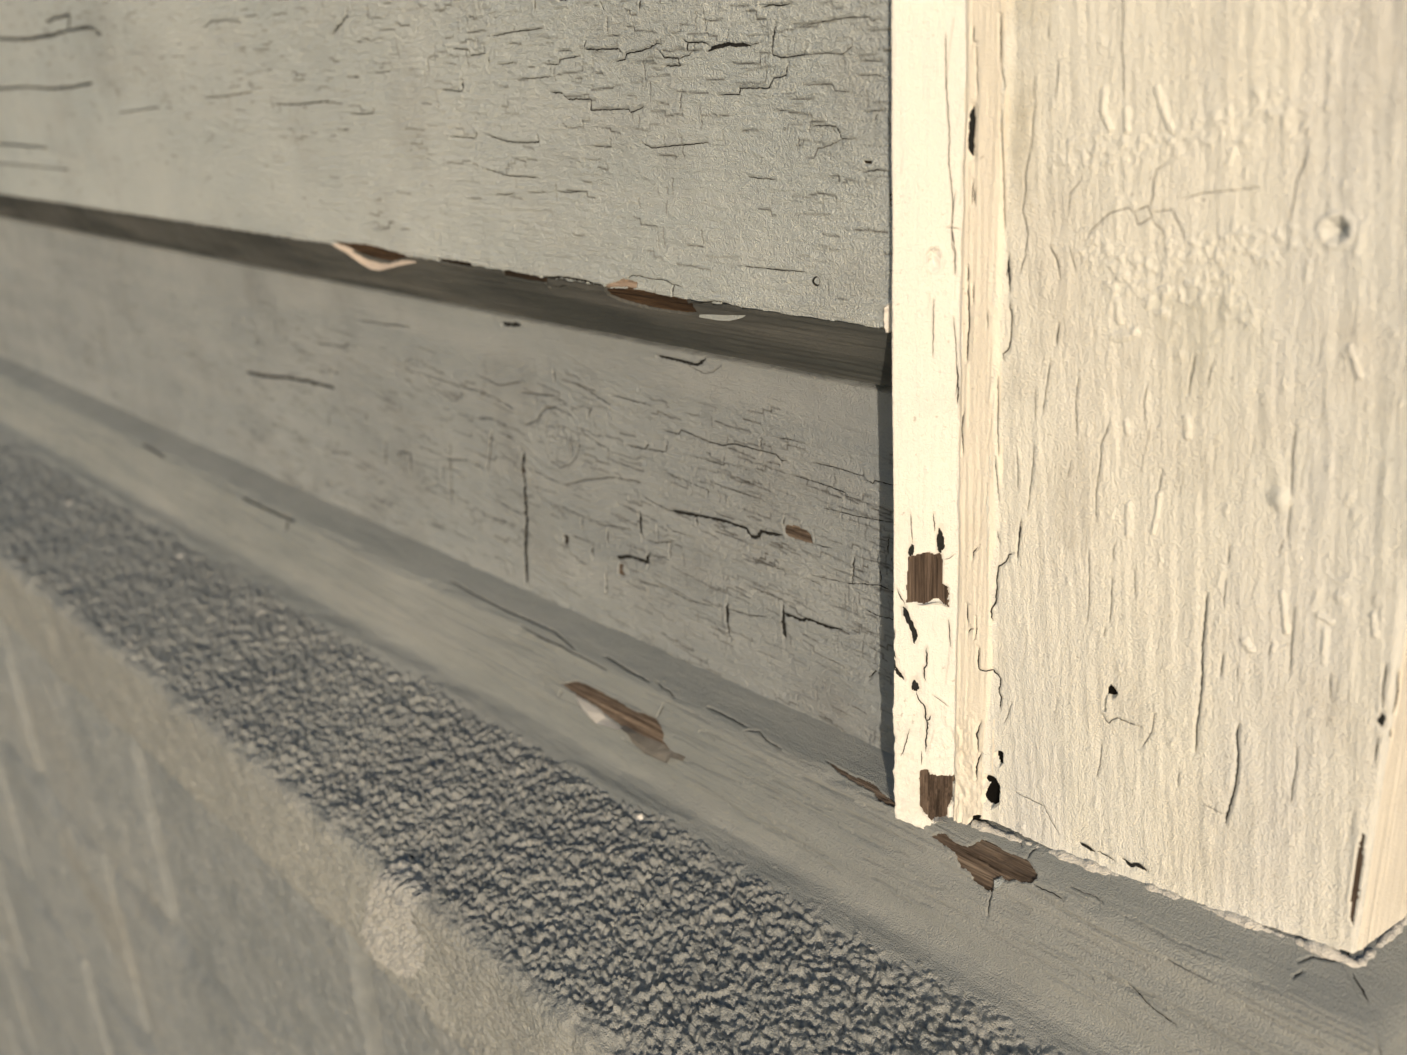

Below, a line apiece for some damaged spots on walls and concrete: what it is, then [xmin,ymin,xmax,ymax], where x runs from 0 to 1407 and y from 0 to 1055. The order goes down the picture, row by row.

crack [0,12,101,42]
crack [0,82,93,91]
peeling [333,240,416,271]
peeling [606,278,745,321]
crack [242,0,1260,782]
peeling [906,552,949,608]
peeling [561,681,685,763]
crack [1374,664,1399,763]
peeling [826,761,895,807]
crack [1205,726,1239,824]
peeling [919,769,1038,892]
crack [1016,792,1147,900]